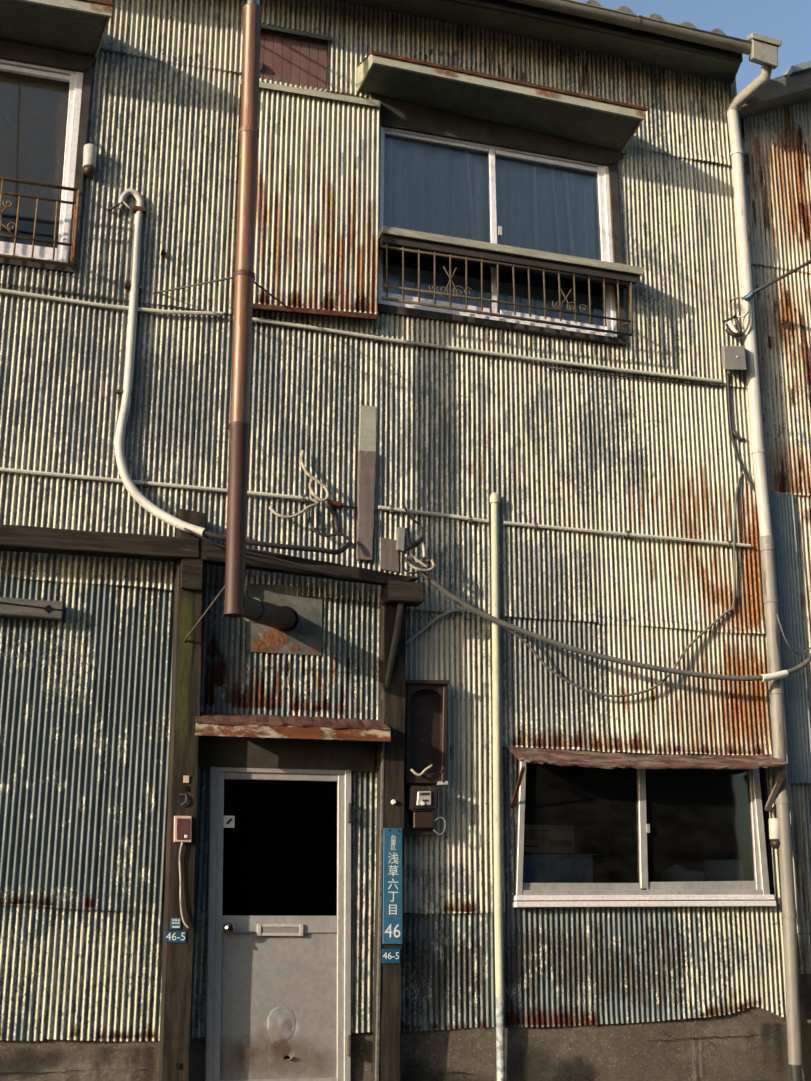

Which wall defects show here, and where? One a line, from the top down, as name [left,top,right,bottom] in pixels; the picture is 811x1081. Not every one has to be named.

rust [256,158,376,313]
rust [741,109,811,247]
rust [757,291,811,408]
rust [774,453,811,494]
rust [671,460,762,632]
peeling [0,616,169,786]
rust [201,628,359,713]
rust [511,647,768,755]
peeling [0,750,68,794]
peeling [99,782,156,898]
rust [504,999,599,1026]
rust [701,1001,757,1017]